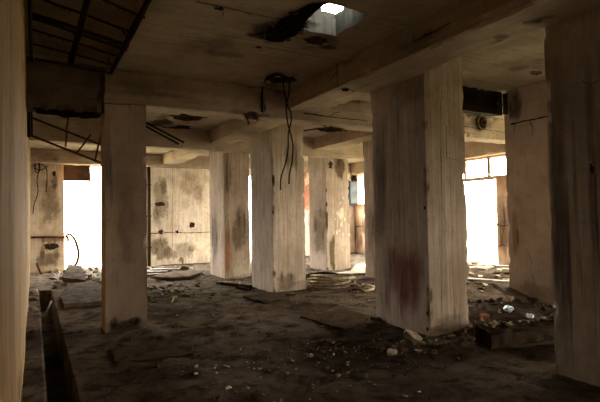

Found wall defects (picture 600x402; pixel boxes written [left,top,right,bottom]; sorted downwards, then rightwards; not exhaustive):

spalling [162,113,211,129]
leakage [151,239,172,260]